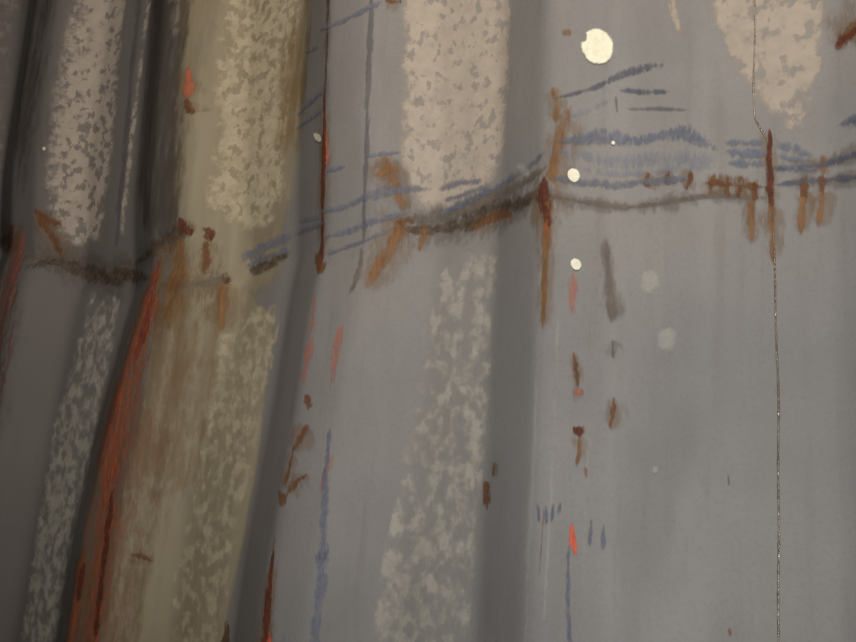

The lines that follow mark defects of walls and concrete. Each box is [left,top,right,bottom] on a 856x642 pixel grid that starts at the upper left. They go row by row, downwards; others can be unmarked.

corrosion [836,22,856,49]
corrosion [536,89,569,319]
corrosion [766,129,774,260]
corrosion [798,157,826,232]
corrosion [202,242,211,273]
corrosion [67,239,187,642]
corrosion [262,549,274,642]